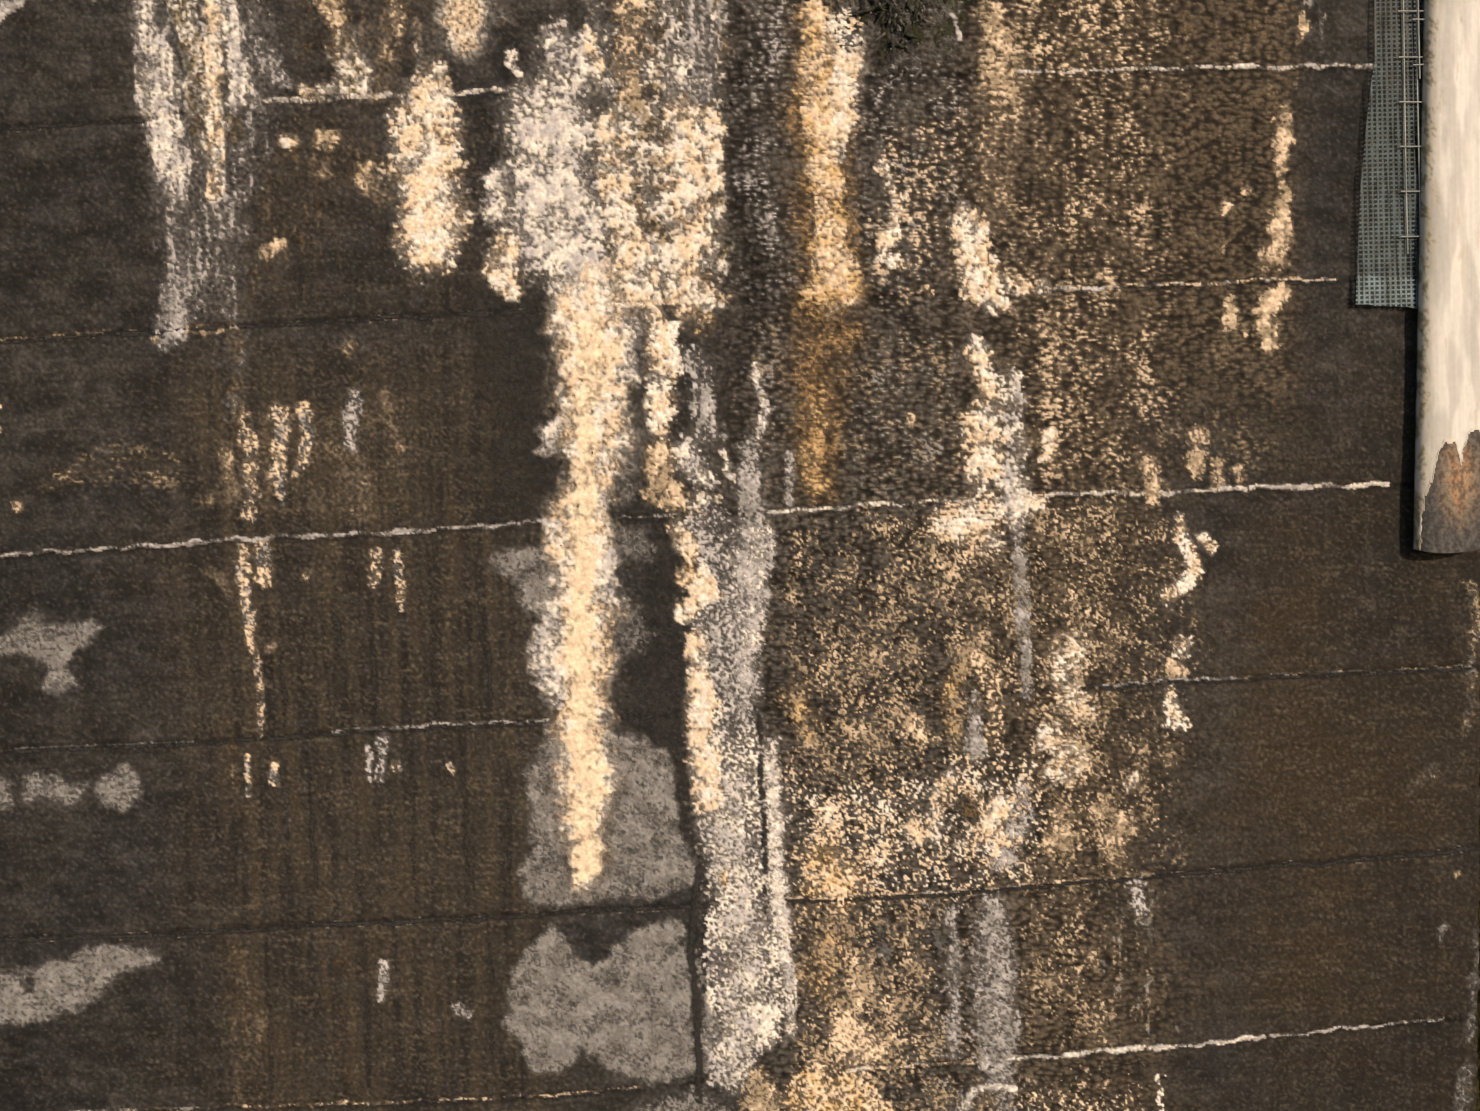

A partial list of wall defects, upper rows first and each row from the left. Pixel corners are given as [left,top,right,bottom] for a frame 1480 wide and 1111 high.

damp [873,159,917,269]
damp [949,202,1043,316]
damp [1221,105,1296,353]
damp [1139,456,1163,505]
damp [1183,427,1244,491]
damp [131,0,798,1092]
damp [902,333,1153,870]
damp [1160,515,1218,607]
damp [1161,634,1193,768]
damp [1127,875,1149,925]
damp [930,891,1021,1111]
damp [1155,1074,1166,1111]